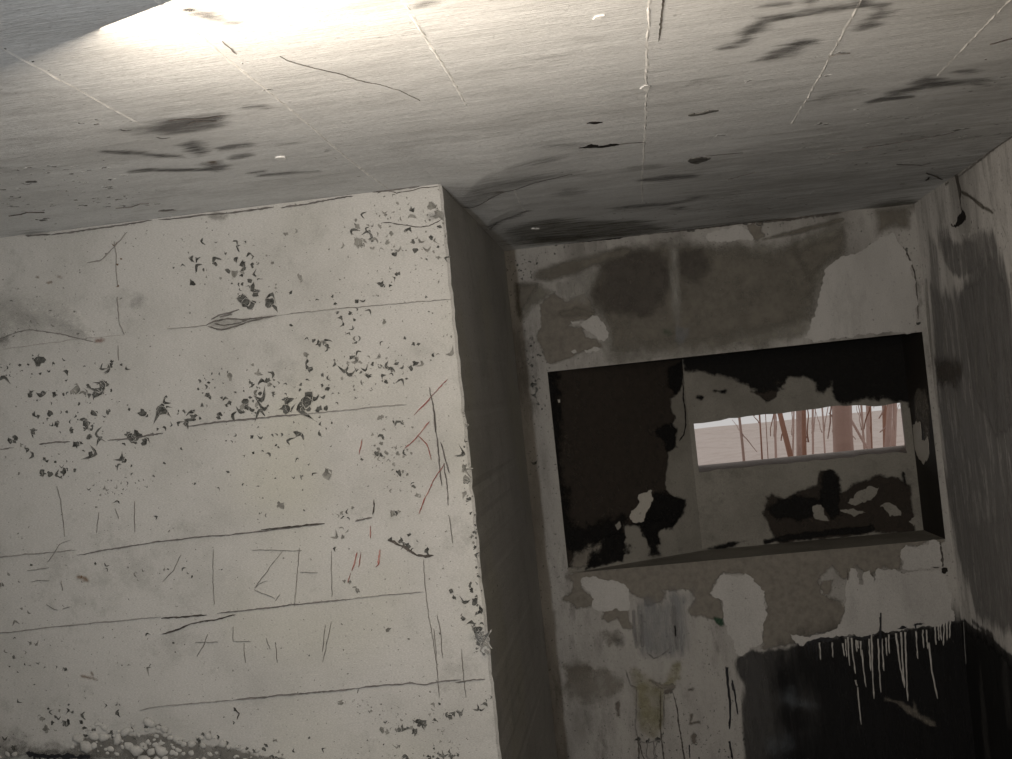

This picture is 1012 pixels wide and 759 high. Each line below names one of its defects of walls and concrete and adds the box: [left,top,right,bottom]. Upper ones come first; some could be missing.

crack [280,56,420,101]
spalling [173,228,303,314]
spalling [340,194,451,324]
peeling [706,218,844,243]
peeling [805,233,922,342]
crack [0,329,125,349]
spalling [0,291,455,508]
spalling [448,439,492,656]
peeling [615,490,653,530]
peeling [812,504,829,521]
peeling [840,486,921,526]
peeling [563,539,955,656]